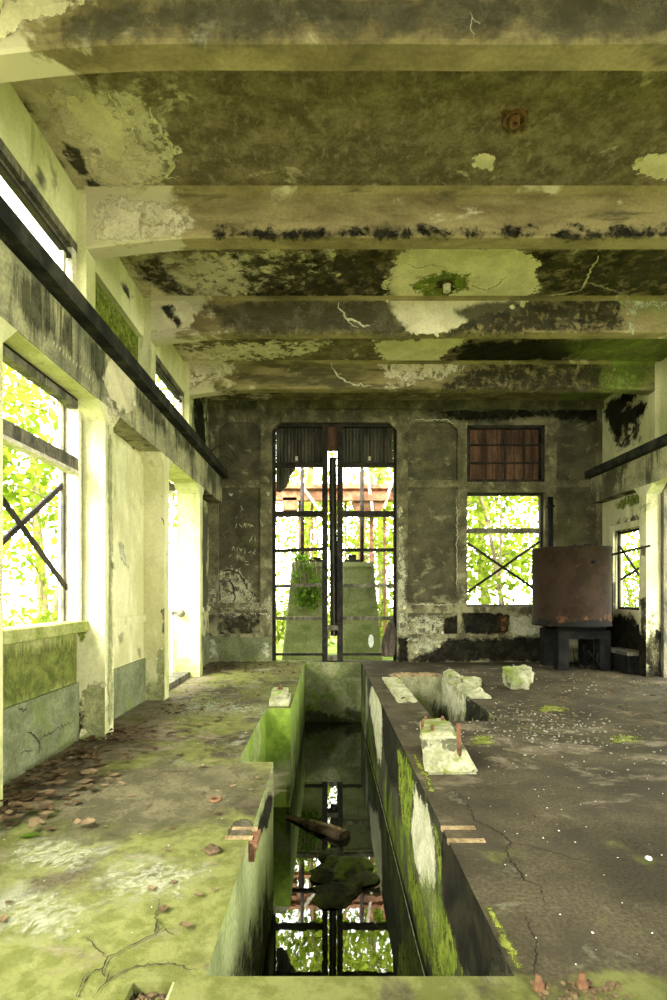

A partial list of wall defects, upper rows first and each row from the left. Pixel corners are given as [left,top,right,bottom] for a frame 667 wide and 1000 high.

peeling [44,77,197,244]
leakage [204,223,484,338]
crack [338,303,370,328]
peeling [371,249,543,387]
leakage [441,222,667,393]
crack [548,257,622,296]
crack [331,364,372,387]
leakage [415,393,647,447]
peeling [508,614,541,637]
crack [452,788,577,974]
crack [76,897,196,997]